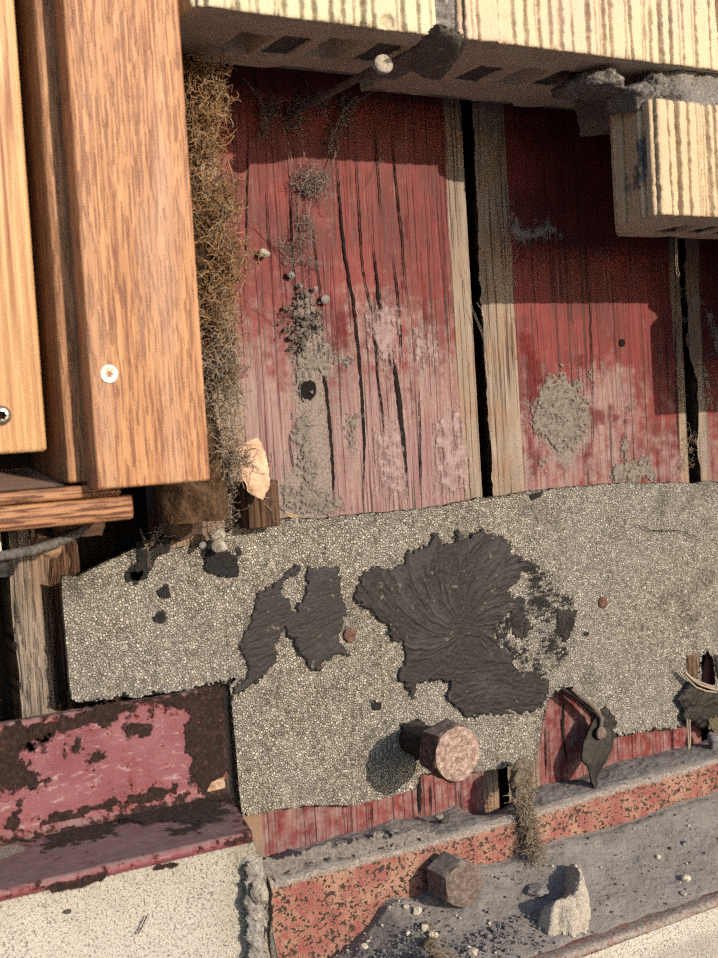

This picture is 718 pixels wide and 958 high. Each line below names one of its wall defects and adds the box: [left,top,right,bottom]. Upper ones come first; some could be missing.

peeling [280,410,359,516]
corrosion [0,693,154,832]
corrosion [39,685,236,856]
corrosion [42,873,108,893]
corrosion [151,862,179,871]